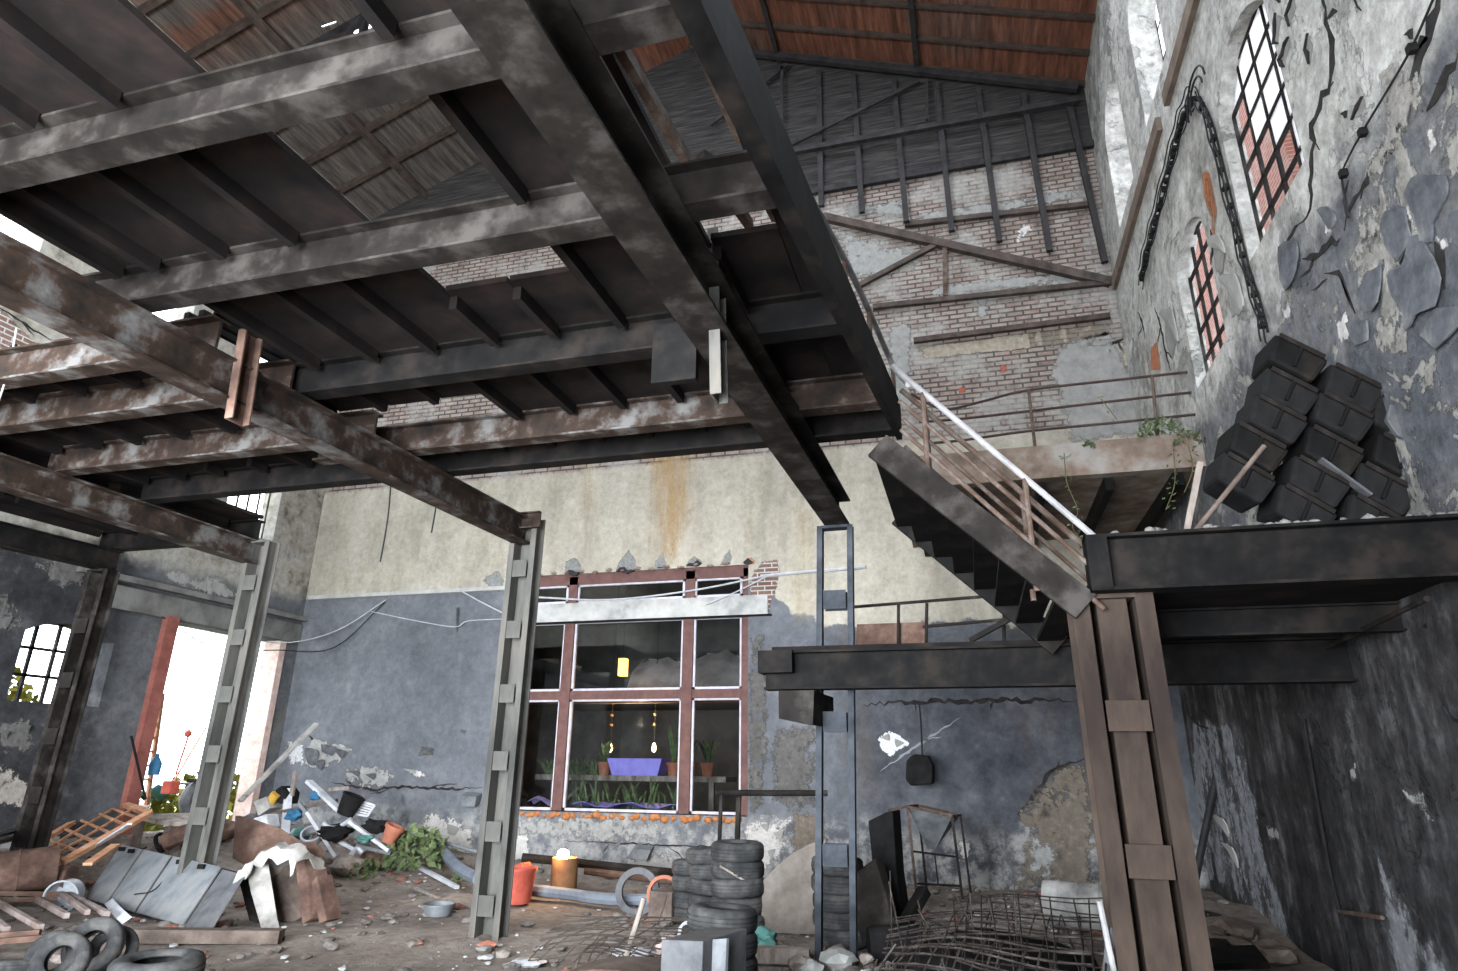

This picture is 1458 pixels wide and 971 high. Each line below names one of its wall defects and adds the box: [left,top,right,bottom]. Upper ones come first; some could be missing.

flaking render [1272,0,1313,68]
crack [1286,0,1458,314]
spalling [1340,62,1425,184]
flaking render [1317,206,1337,235]
flaking render [1335,110,1458,354]
flaking render [1277,237,1301,319]
flaking render [0,309,35,349]
flaking render [0,594,23,635]
flaking render [35,560,85,589]
flaking render [304,738,434,788]
flaking render [880,764,1107,971]
water stain [1377,857,1446,971]